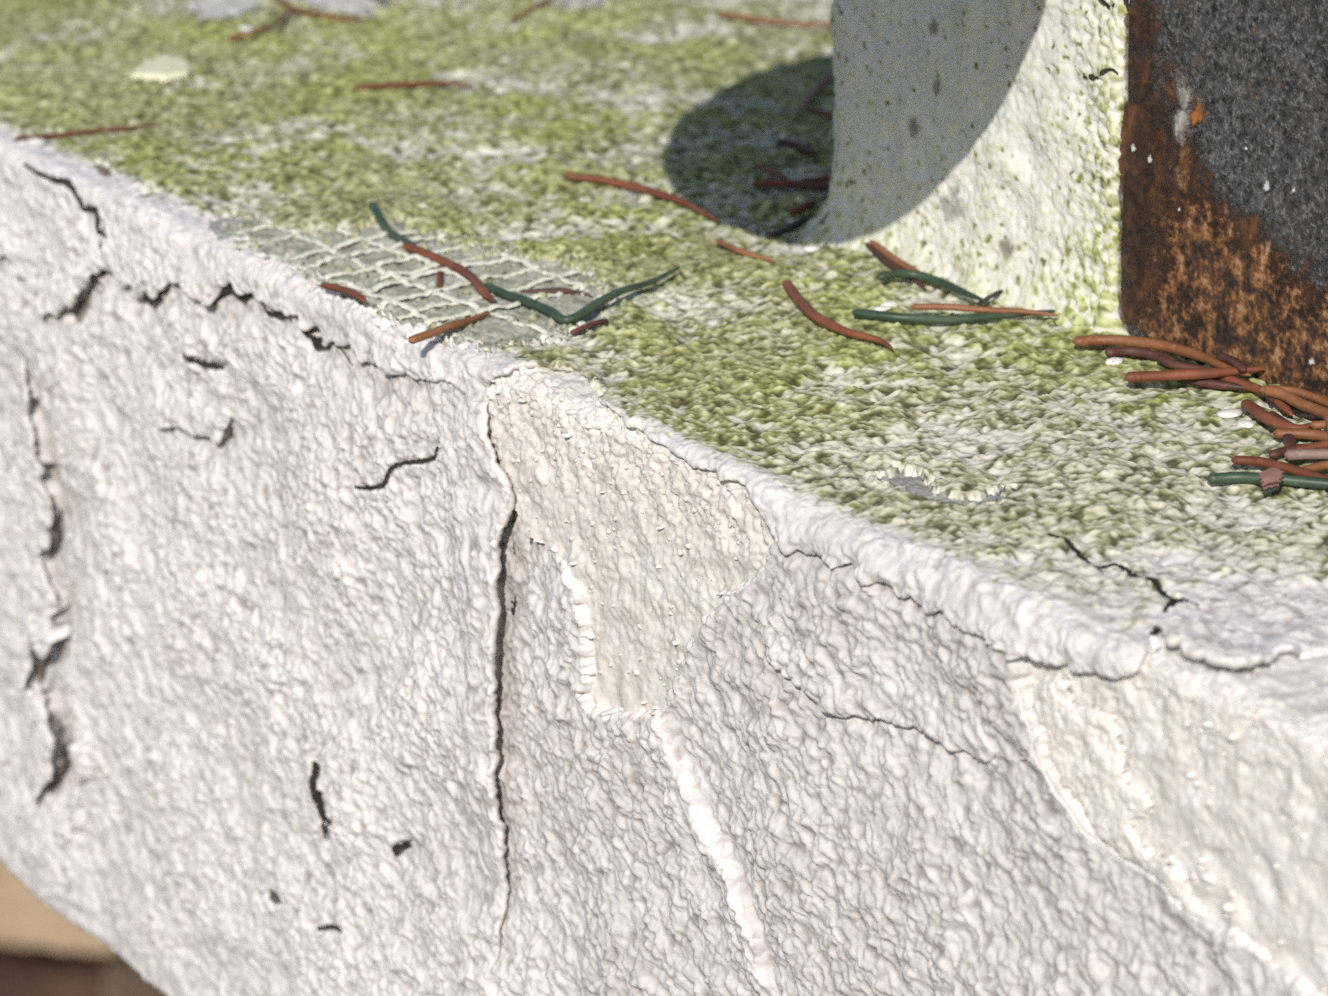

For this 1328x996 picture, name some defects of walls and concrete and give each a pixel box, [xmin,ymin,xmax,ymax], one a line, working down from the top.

crack [22,162,107,285]
rust [1118,0,1328,407]
crack [142,291,162,307]
crack [354,446,439,490]
crack [505,592,516,676]
flaking render [0,217,1328,996]
crack [1046,533,1199,635]